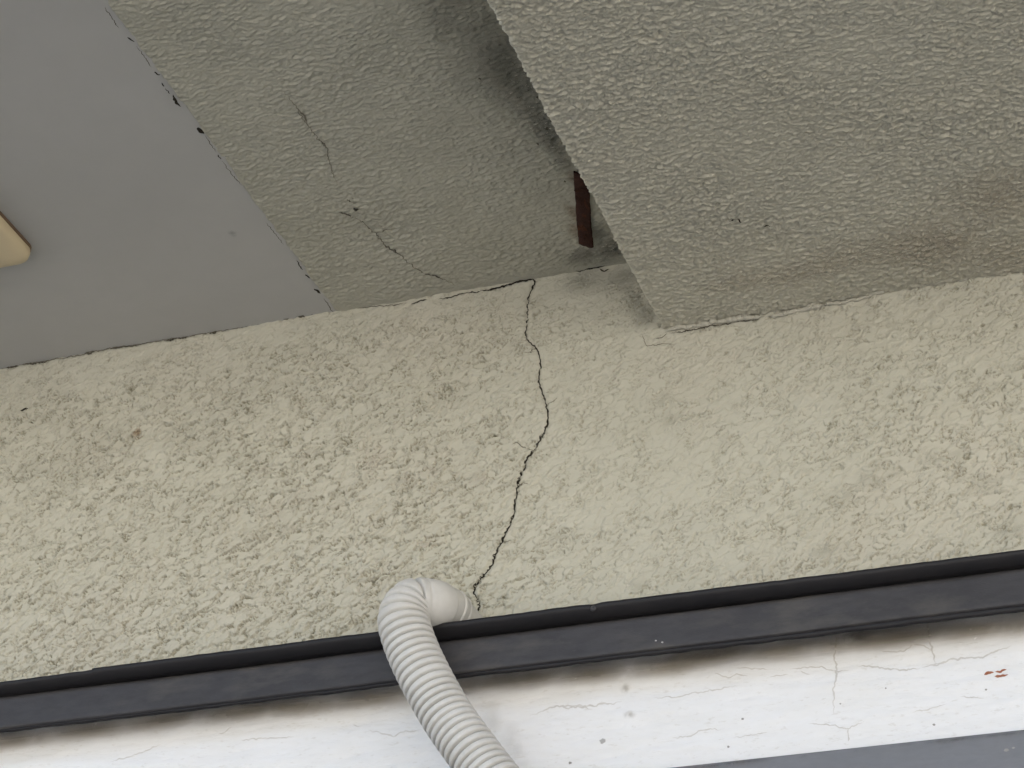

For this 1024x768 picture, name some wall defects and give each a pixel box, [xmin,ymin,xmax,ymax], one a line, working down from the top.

crack [285,94,557,611]
crack [656,623,1008,741]